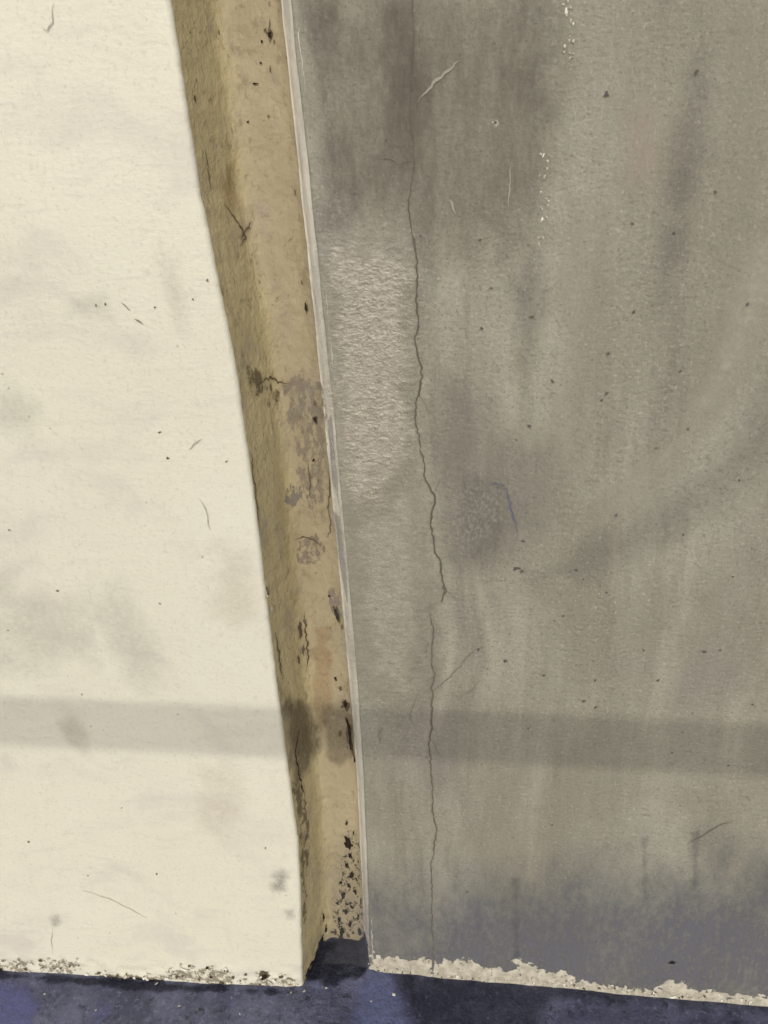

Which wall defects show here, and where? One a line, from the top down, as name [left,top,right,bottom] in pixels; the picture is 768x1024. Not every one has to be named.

crack [378,0,482,973]
mould [321,821,363,941]
peeling [356,948,768,1024]